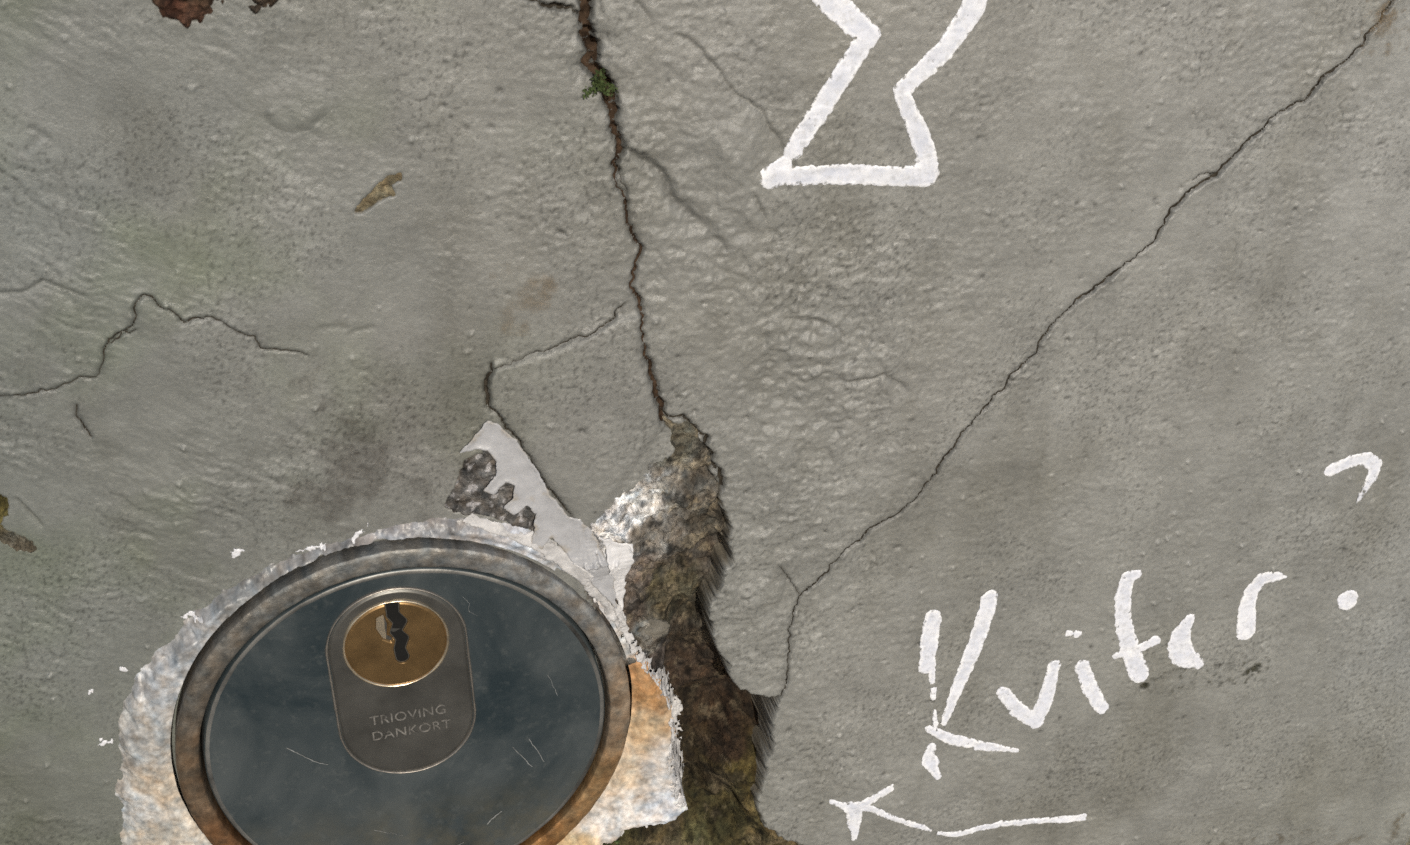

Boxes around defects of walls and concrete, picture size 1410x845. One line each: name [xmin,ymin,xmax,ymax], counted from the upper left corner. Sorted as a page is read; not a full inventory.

spalling [152,0,224,28]
spalling [248,0,278,14]
crack [484,0,723,512]
crack [3,294,307,437]
crack [780,0,1393,695]
spalling [0,494,37,553]
peeling [181,611,203,623]
spalling [444,415,798,845]